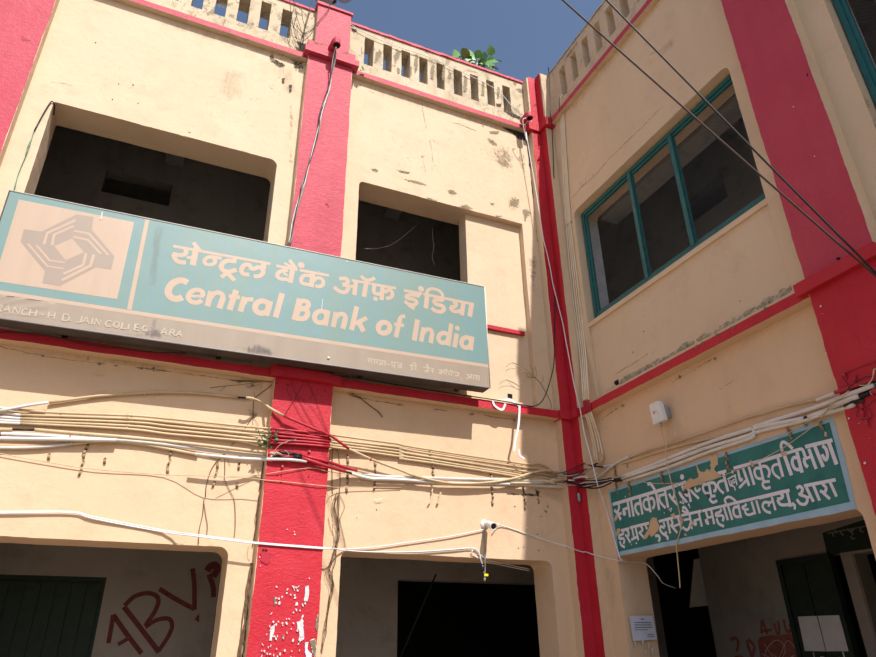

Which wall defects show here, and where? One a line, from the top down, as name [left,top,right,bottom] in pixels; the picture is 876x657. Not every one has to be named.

spalling [508,196,530,221]
spalling [614,285,792,385]
spalling [310,613,320,657]